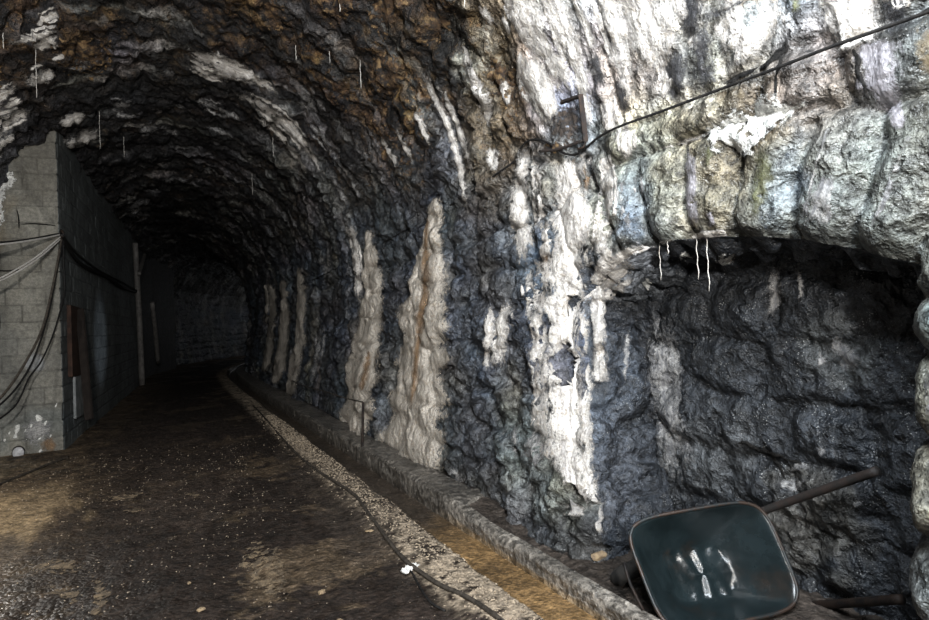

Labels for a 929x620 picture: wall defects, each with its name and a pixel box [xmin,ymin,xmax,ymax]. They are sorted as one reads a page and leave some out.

leakage [9,7,64,86]
leakage [714,0,798,66]
leakage [0,83,27,151]
leakage [464,48,493,125]
leakage [0,172,17,225]
leakage [665,93,805,239]
leakage [349,227,364,303]
corrosion [411,223,431,400]
leakage [478,0,702,533]
leakage [715,254,734,266]
leakage [769,271,780,312]
leakage [781,463,809,491]